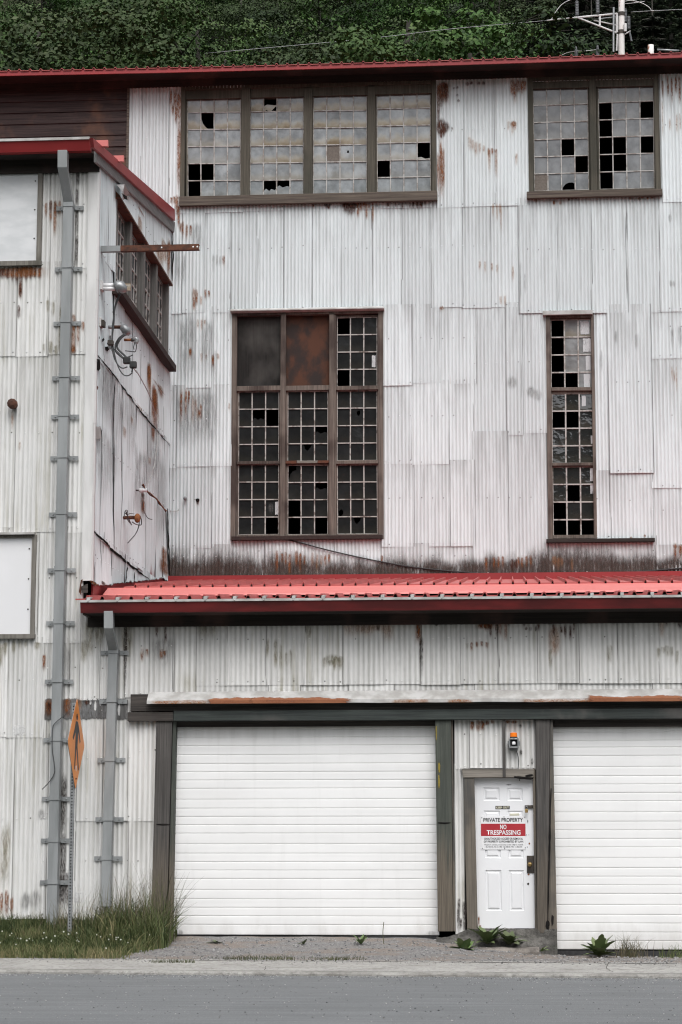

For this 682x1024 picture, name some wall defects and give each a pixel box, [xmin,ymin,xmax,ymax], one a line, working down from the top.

rust [170,92,181,178]
rust [437,82,484,188]
rust [0,267,41,317]
rust [148,365,163,436]
damp [168,551,682,576]